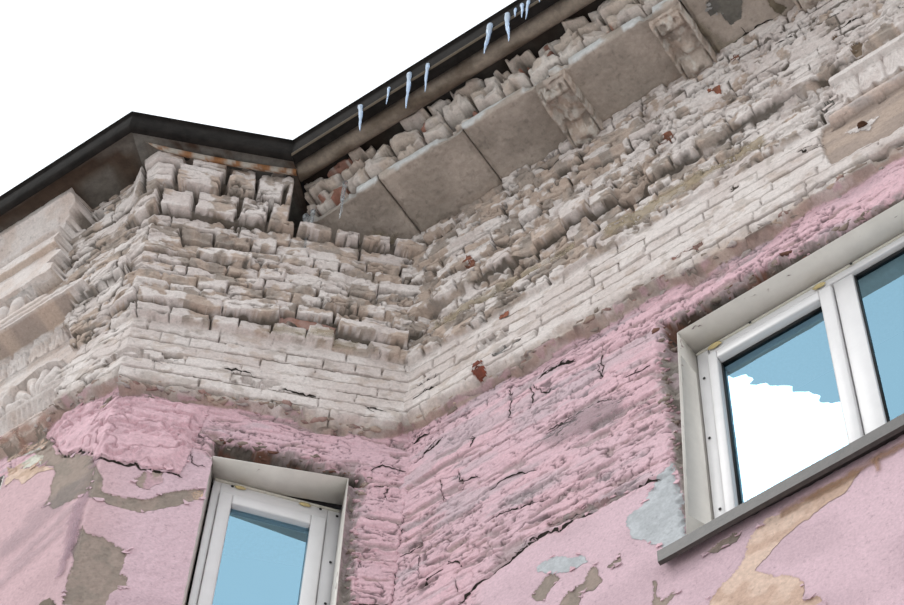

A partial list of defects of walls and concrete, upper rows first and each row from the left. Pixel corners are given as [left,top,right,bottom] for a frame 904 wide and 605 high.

peeling [705,0,742,25]
spalling [764,209,877,274]
crack [283,388,316,398]
flaking render [471,336,560,382]
crack [508,358,575,418]
crack [547,344,610,435]
peeling [626,285,732,548]
peeling [39,525,134,605]
crack [351,428,612,605]
peeling [531,552,621,605]
peeling [652,580,681,605]
peeling [700,470,861,605]